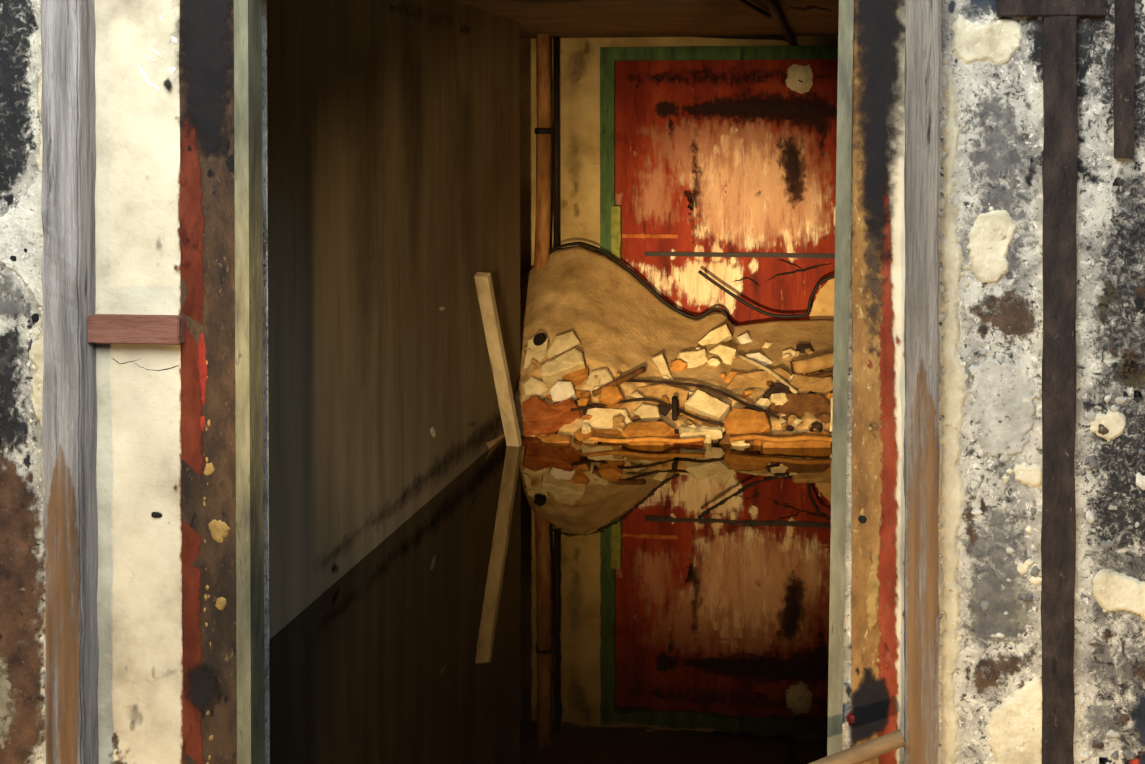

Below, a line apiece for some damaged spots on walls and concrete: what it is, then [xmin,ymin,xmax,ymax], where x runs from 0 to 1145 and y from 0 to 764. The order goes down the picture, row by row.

damp [0,0,40,205]
peeling [630,128,836,320]
peeling [785,64,813,94]
rust [861,187,890,356]
damp [965,16,1043,308]
peeling [151,113,230,764]
spalling [522,395,608,436]
flaking render [938,14,1042,764]
peeling [1078,393,1145,620]
peeling [1077,699,1145,764]